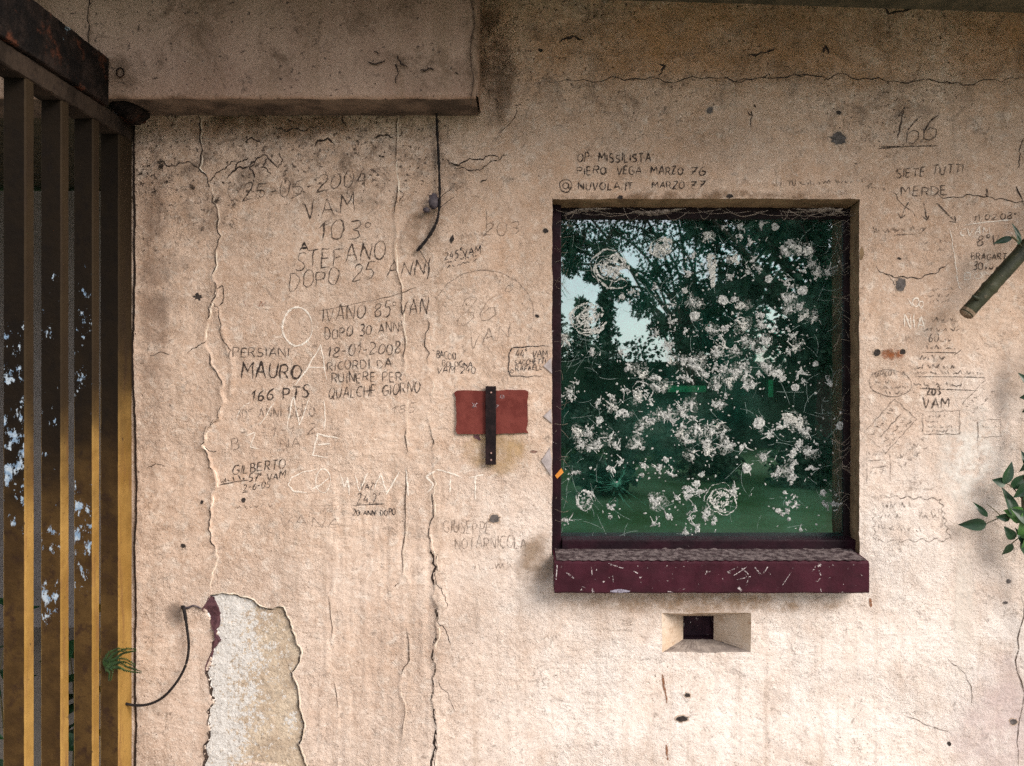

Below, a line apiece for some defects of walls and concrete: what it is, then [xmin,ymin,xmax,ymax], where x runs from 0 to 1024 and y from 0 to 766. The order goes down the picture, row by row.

crack [374,116,404,212]
crack [548,73,1022,125]
crack [325,243,435,452]
crack [876,263,949,285]
crack [132,115,346,766]
spalling [202,592,308,766]
crack [395,477,454,766]